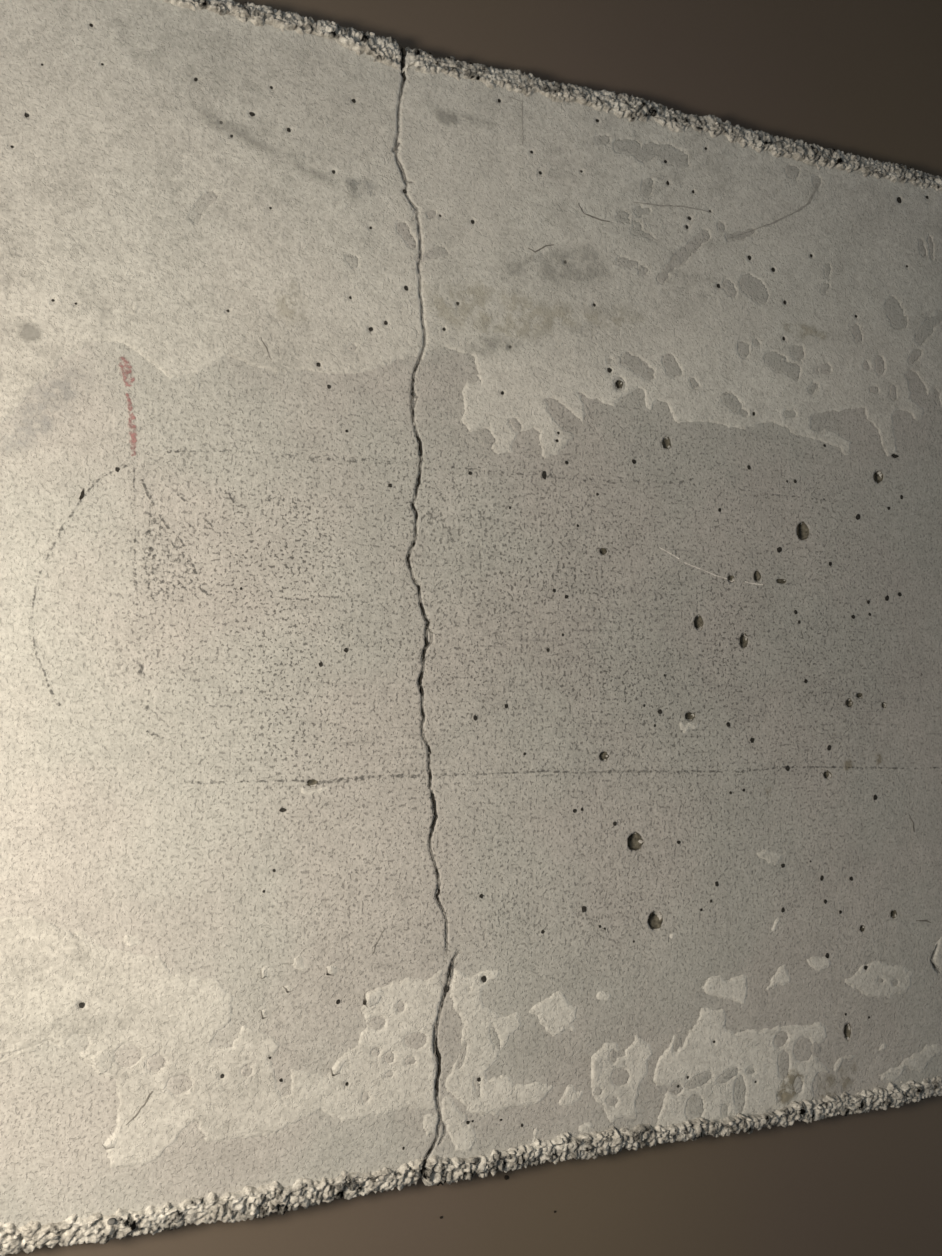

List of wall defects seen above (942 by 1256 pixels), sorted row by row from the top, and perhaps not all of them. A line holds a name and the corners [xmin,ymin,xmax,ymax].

crack [394,46,458,1178]